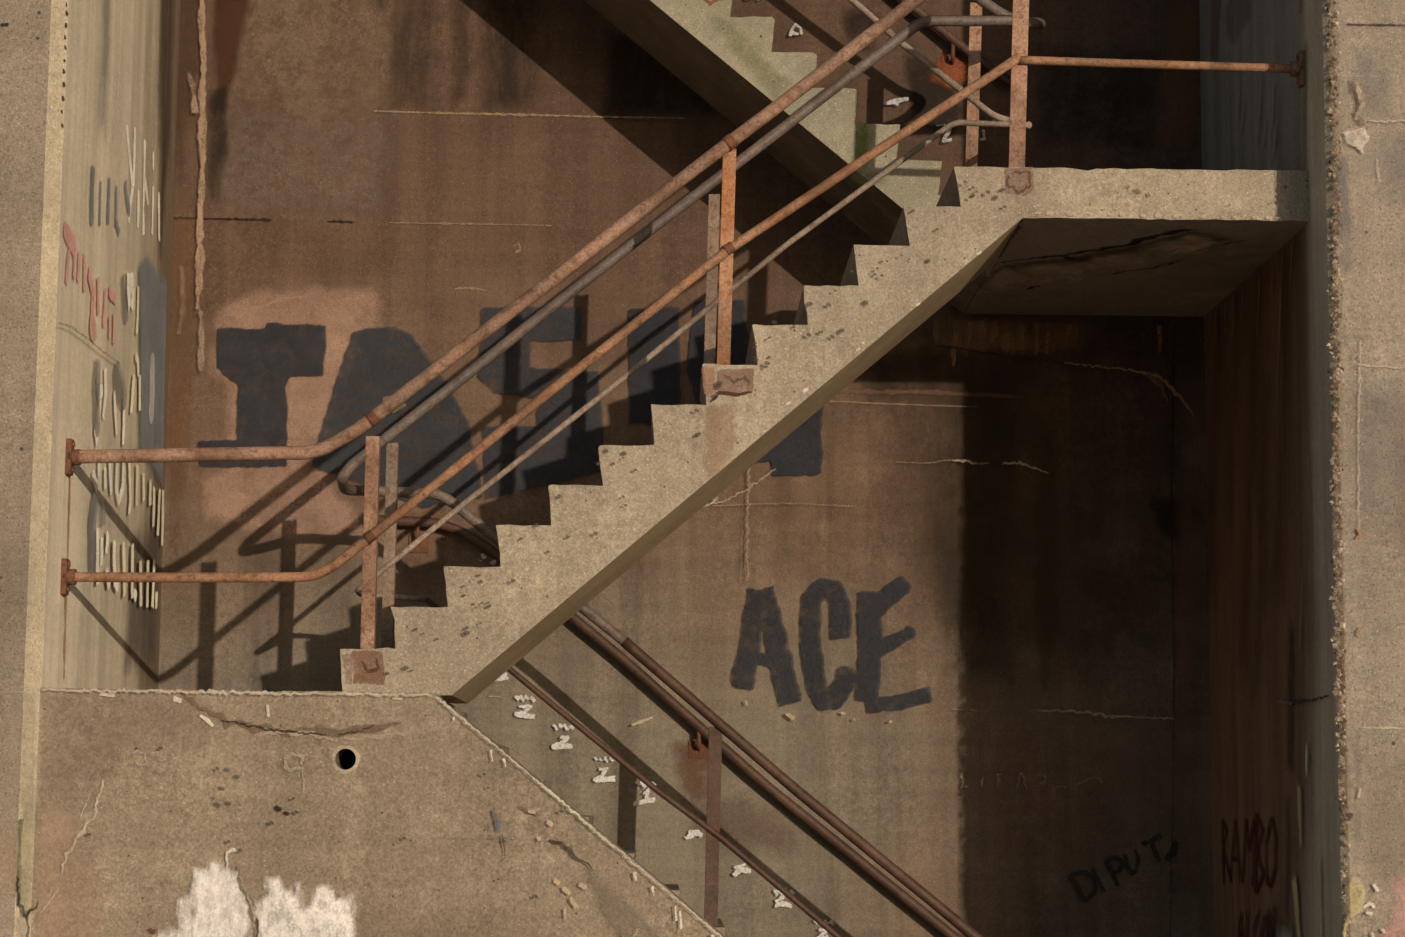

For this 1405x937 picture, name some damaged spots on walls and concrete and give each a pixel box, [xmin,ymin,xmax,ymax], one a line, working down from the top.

water stain [160,0,172,225]
crack [999,220,1023,257]
crack [934,344,1194,417]
water stain [129,534,157,654]
crack [180,692,405,741]
corrosion [352,650,385,685]
crack [2,779,104,937]
water stain [42,688,722,937]